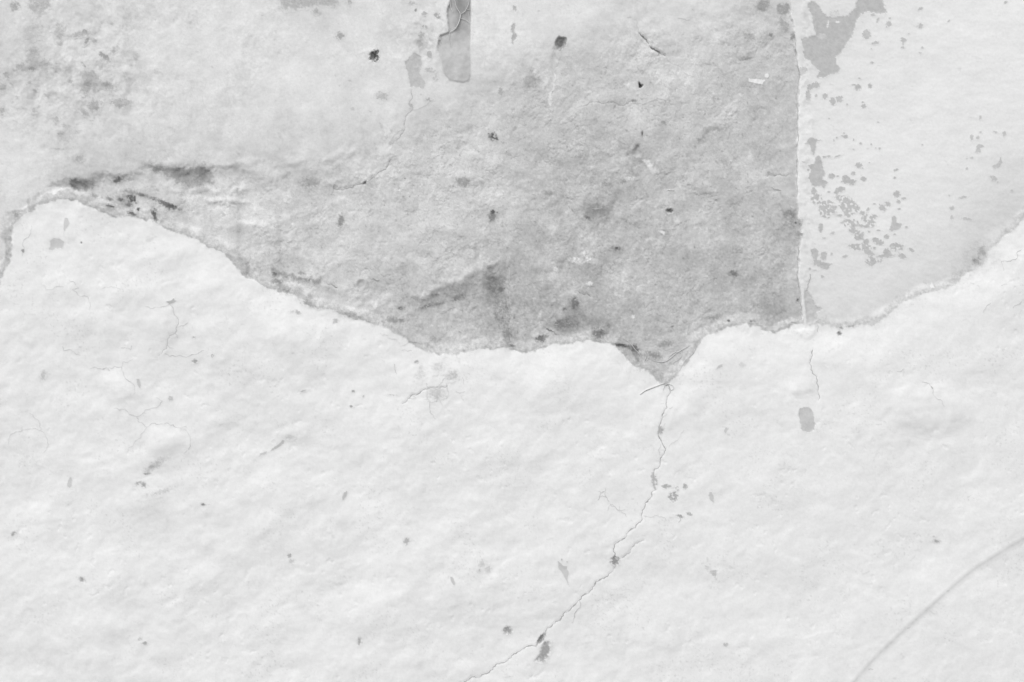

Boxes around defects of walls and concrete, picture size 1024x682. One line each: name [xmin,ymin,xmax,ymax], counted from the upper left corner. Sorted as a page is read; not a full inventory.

spalling [0,0,960,386]
crack [464,385,684,682]